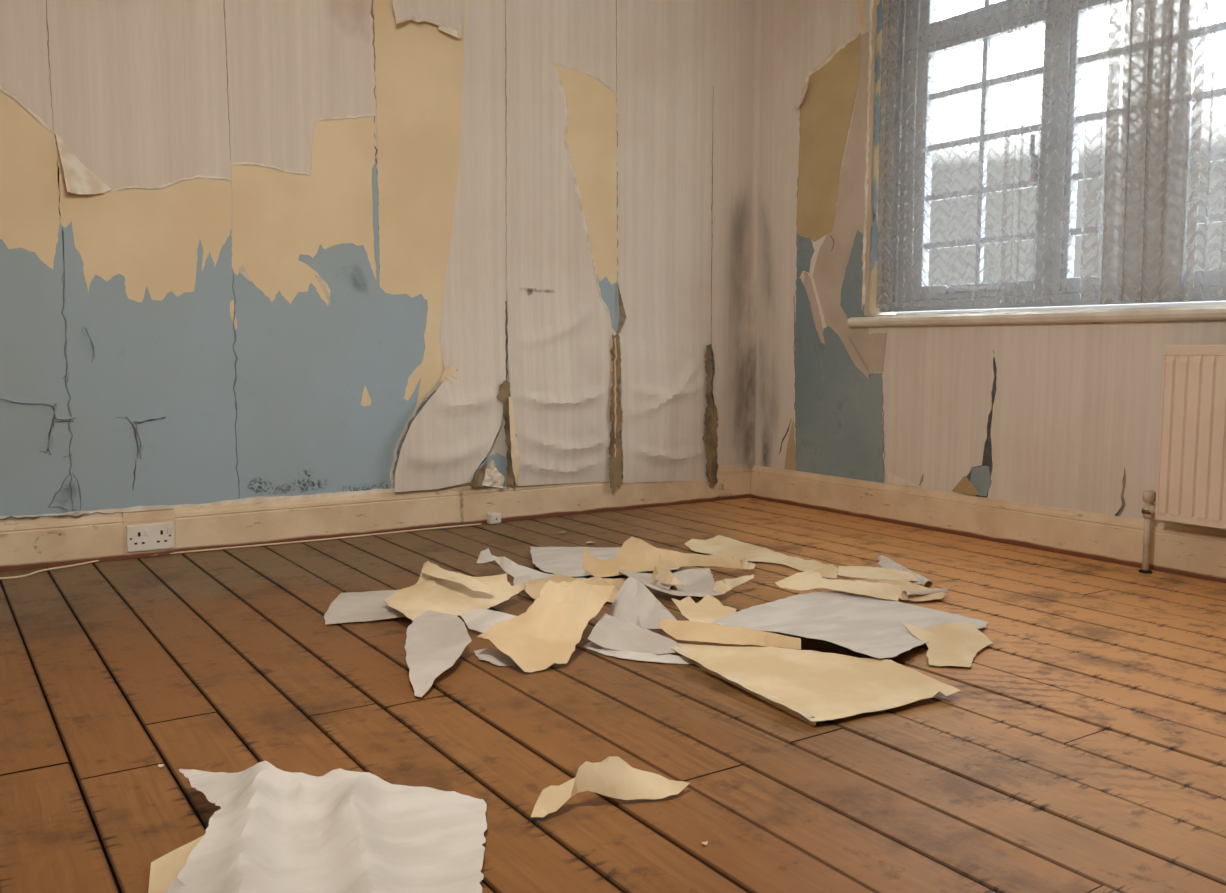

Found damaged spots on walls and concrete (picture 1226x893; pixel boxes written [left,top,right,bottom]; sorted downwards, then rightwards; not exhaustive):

peeling [803,271,825,344]
crack [0,273,166,520]
peeling [361,386,371,406]